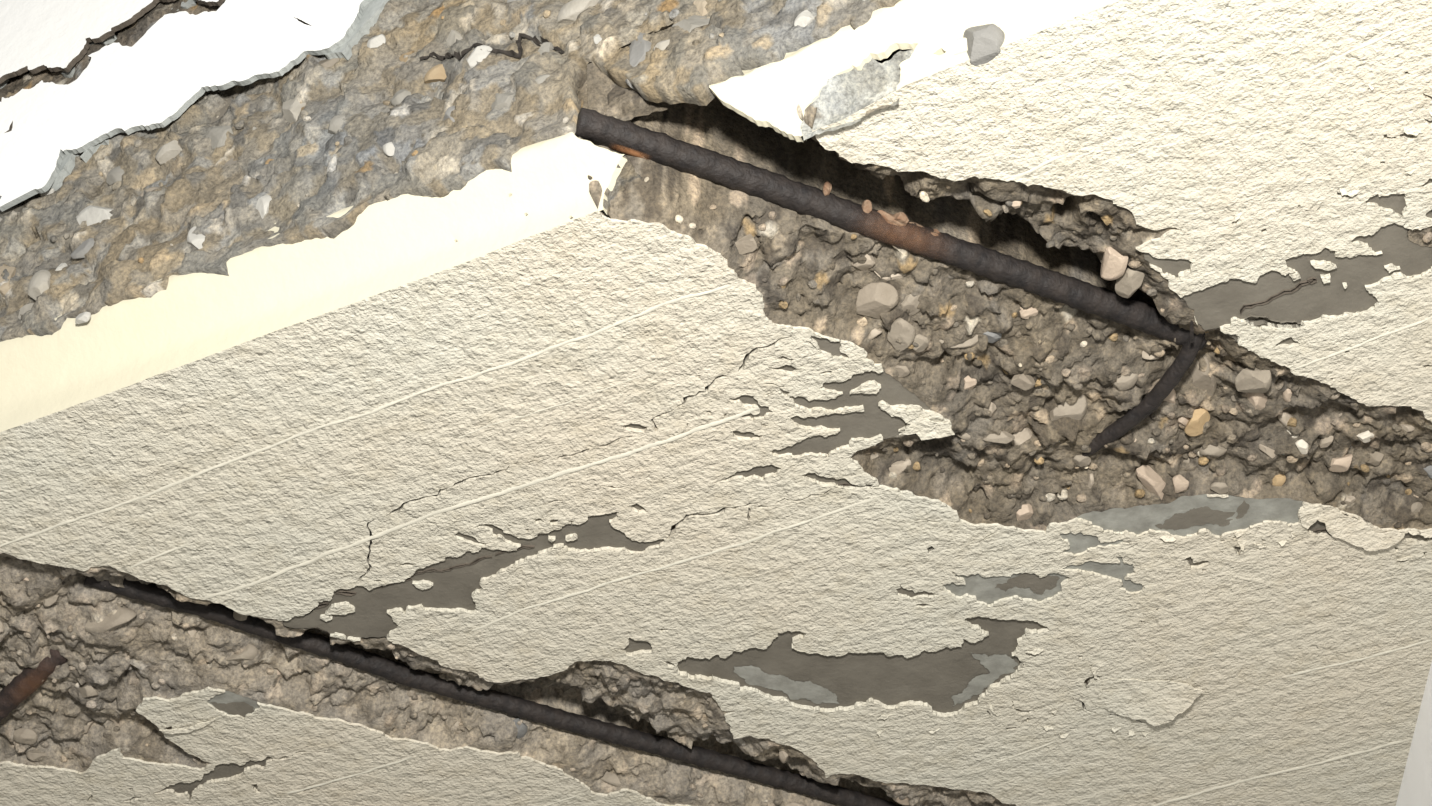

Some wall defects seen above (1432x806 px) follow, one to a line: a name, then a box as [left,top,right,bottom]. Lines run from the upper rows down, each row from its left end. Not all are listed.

crack [0,0,226,100]
corrosion [614,147,644,159]
spalling [0,0,1432,606]
crack [305,472,535,615]
crack [669,503,761,536]
crack [810,482,874,496]
spalling [0,512,1047,806]
peeling [1085,661,1109,685]